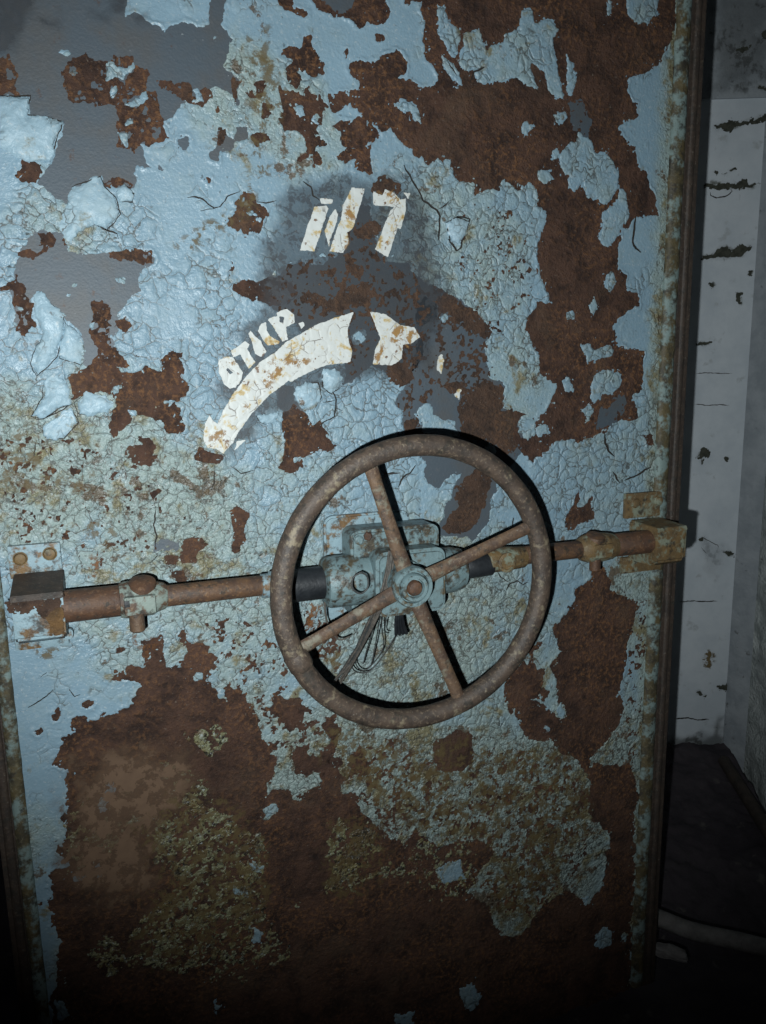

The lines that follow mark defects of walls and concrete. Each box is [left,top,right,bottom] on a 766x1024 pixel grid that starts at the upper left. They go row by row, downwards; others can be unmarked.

corrosion [61,52,220,154]
peeling [209,127,248,161]
peeling [0,0,240,376]
crack [404,165,470,252]
corrosion [228,0,676,473]
peeling [256,204,523,466]
crack [22,404,72,468]
peeling [74,391,114,417]
crack [319,393,342,430]
crack [151,509,159,561]
peeling [420,456,497,542]
corrosion [38,566,647,1024]